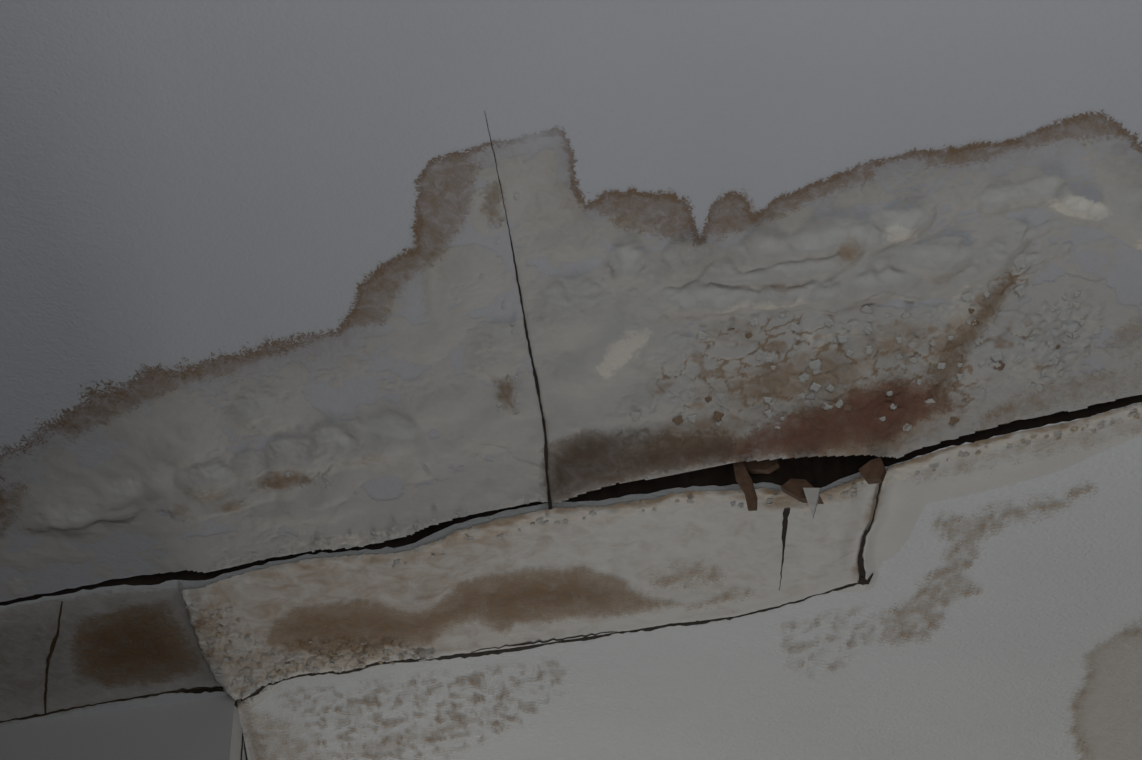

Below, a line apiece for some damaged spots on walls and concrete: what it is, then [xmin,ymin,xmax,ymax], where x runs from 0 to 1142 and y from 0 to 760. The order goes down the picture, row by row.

water stain [0,142,493,518]
crack [0,111,553,723]
water stain [270,570,670,654]
flaking render [148,257,1142,711]
crack [234,395,1142,708]
water stain [568,110,1142,245]